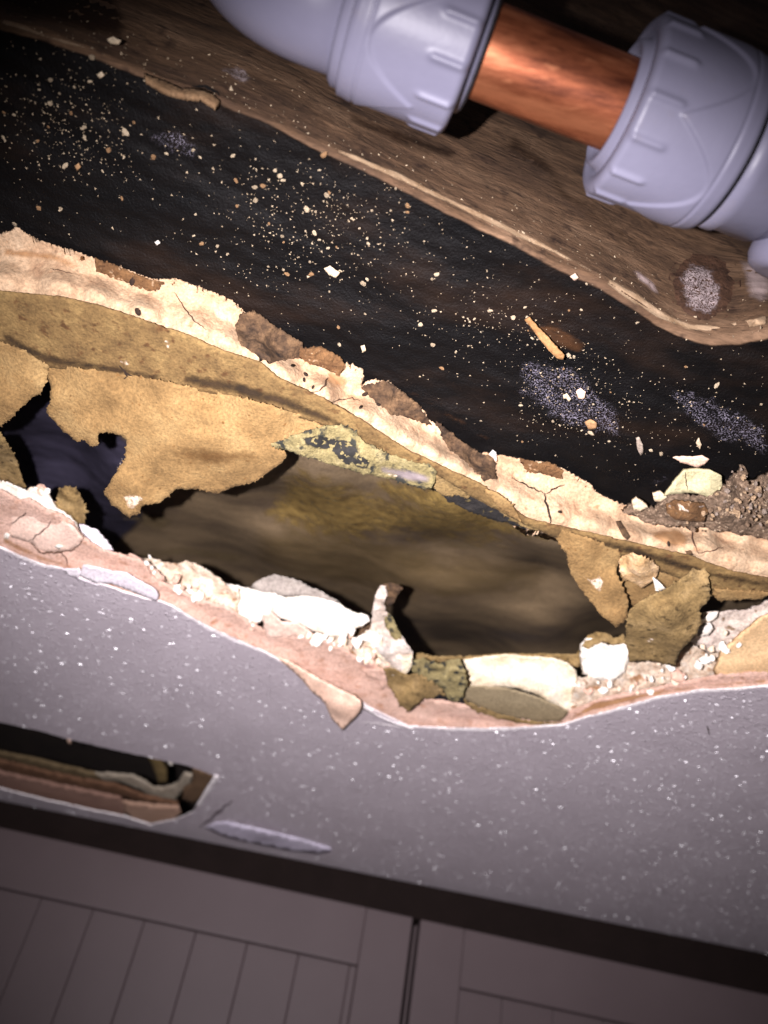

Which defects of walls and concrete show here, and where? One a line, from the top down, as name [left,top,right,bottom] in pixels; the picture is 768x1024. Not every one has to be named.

water stain [0,20,768,507]
spalling [0,227,768,730]
spalling [0,750,219,824]